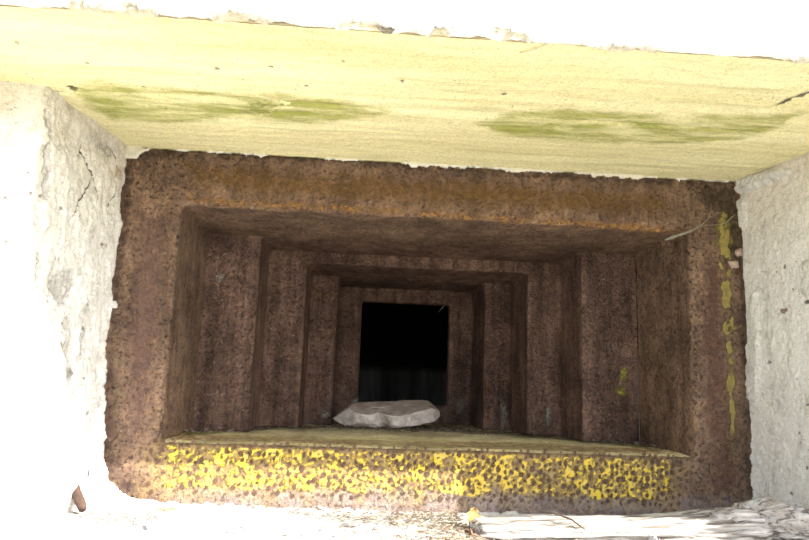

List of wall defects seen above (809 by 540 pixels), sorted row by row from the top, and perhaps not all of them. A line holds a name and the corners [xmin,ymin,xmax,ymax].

damp [67,86,362,122]
damp [482,111,767,143]
rust [689,181,743,274]
rust [104,440,120,472]
rust [171,434,670,452]